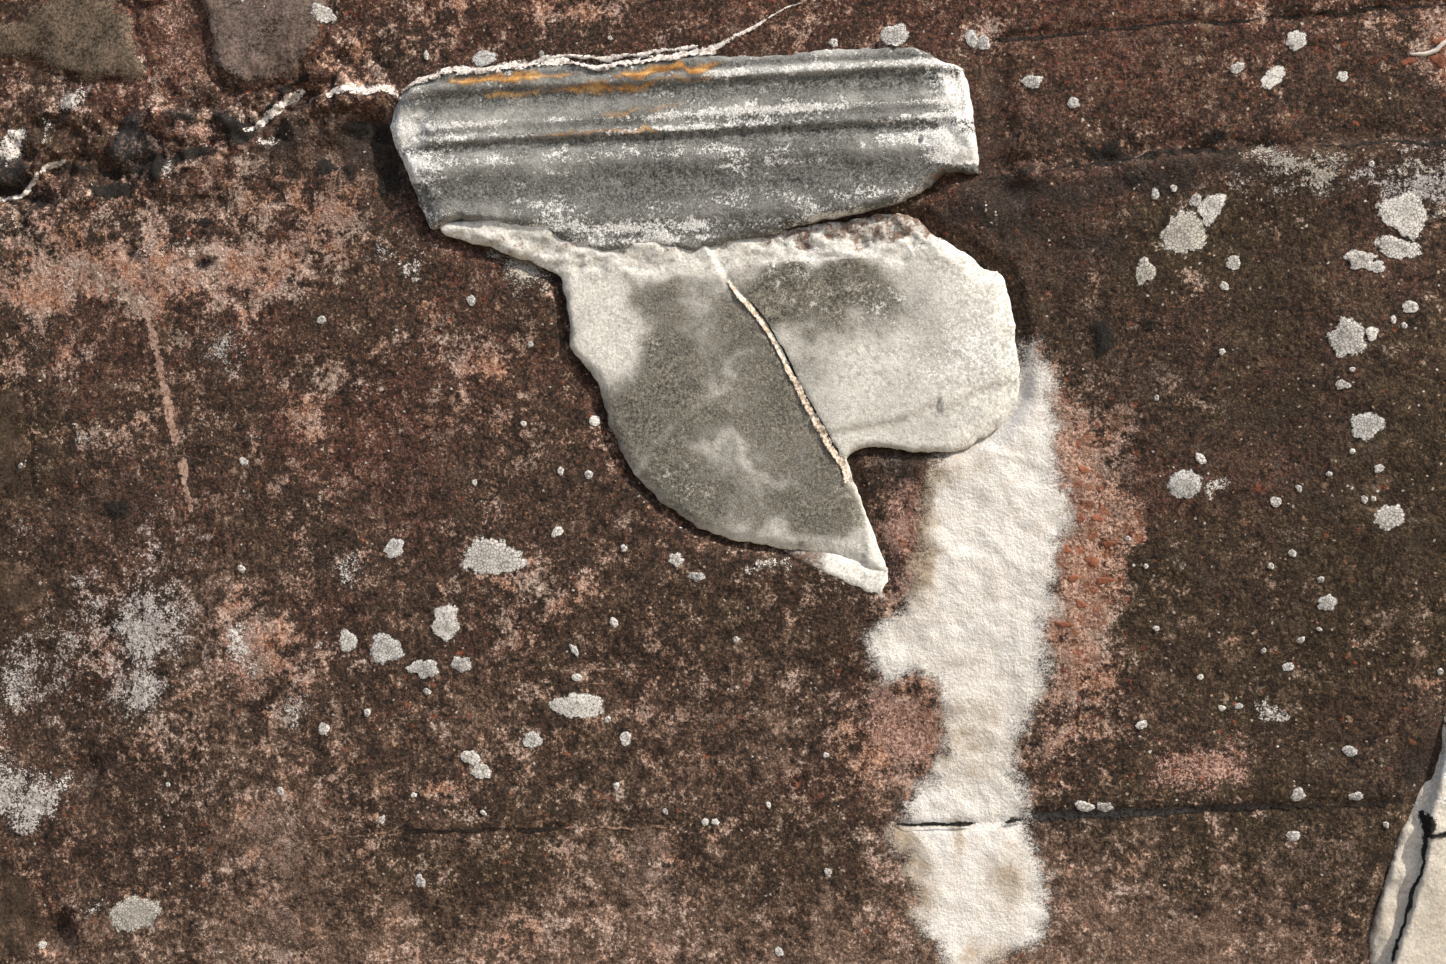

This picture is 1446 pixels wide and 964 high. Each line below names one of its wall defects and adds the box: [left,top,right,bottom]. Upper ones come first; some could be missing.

crack [0,74,310,202]
rust [451,61,717,97]
crack [728,280,850,483]
leakage [865,341,1076,964]
crack [895,798,1446,963]